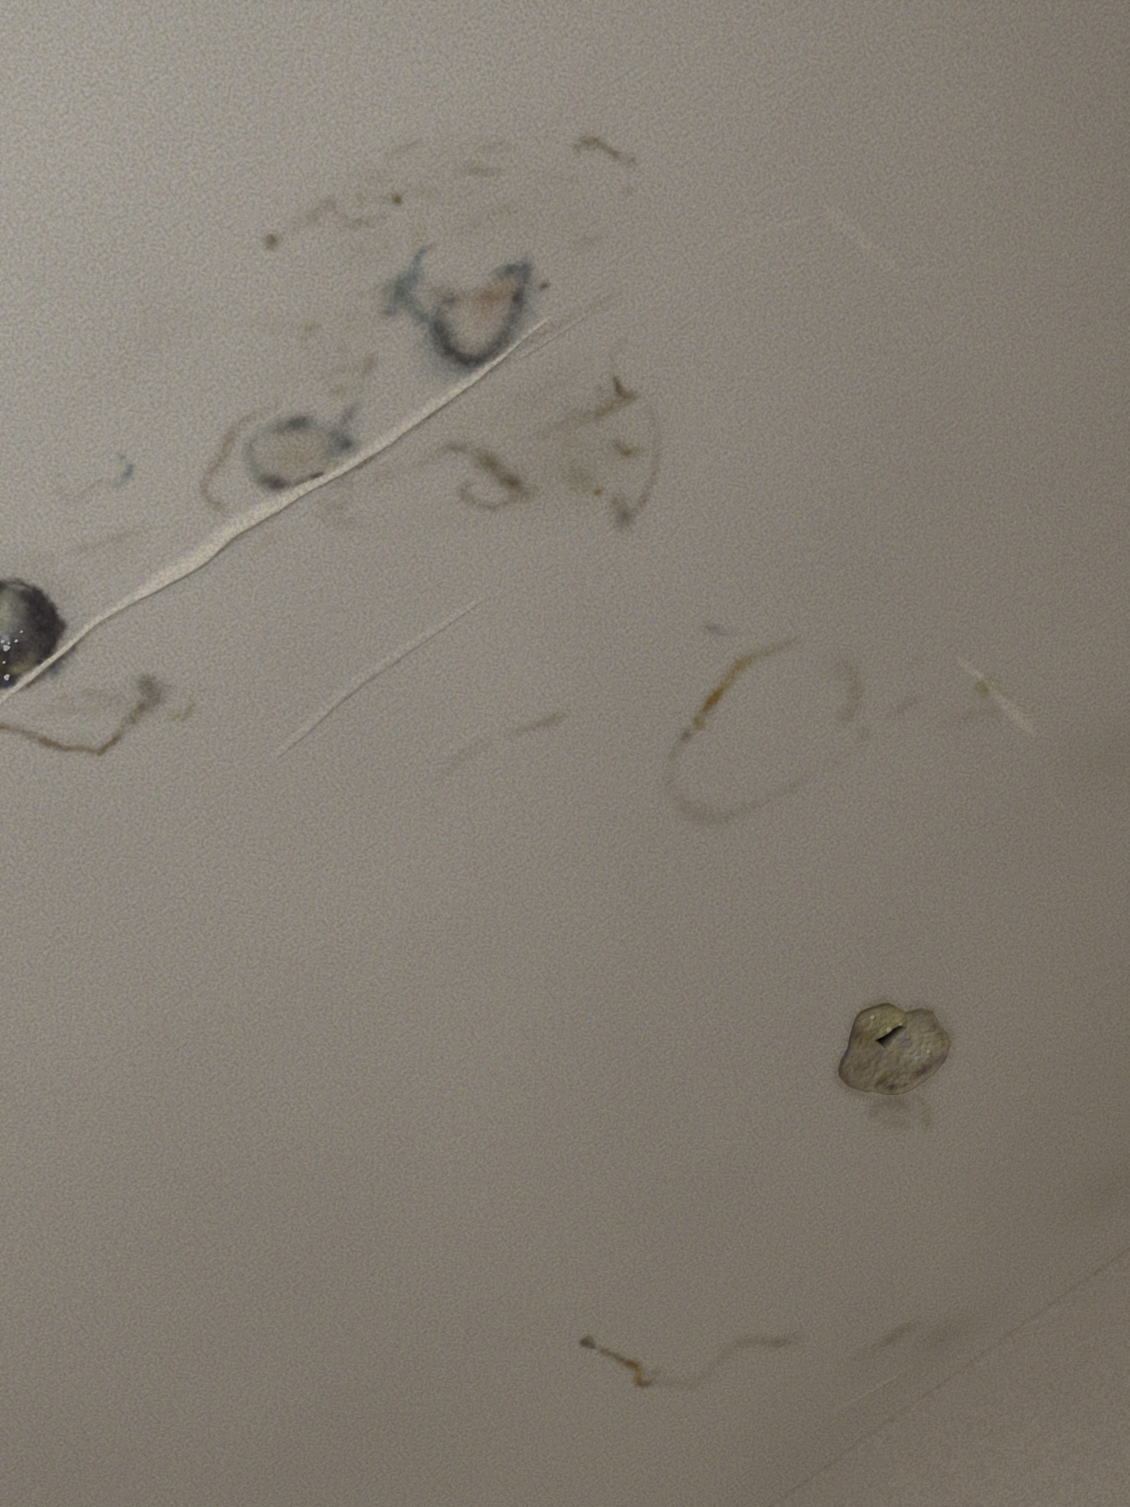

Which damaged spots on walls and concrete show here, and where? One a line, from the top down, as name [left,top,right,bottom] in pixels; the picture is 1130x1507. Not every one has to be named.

spalling [838,1003,951,1095]